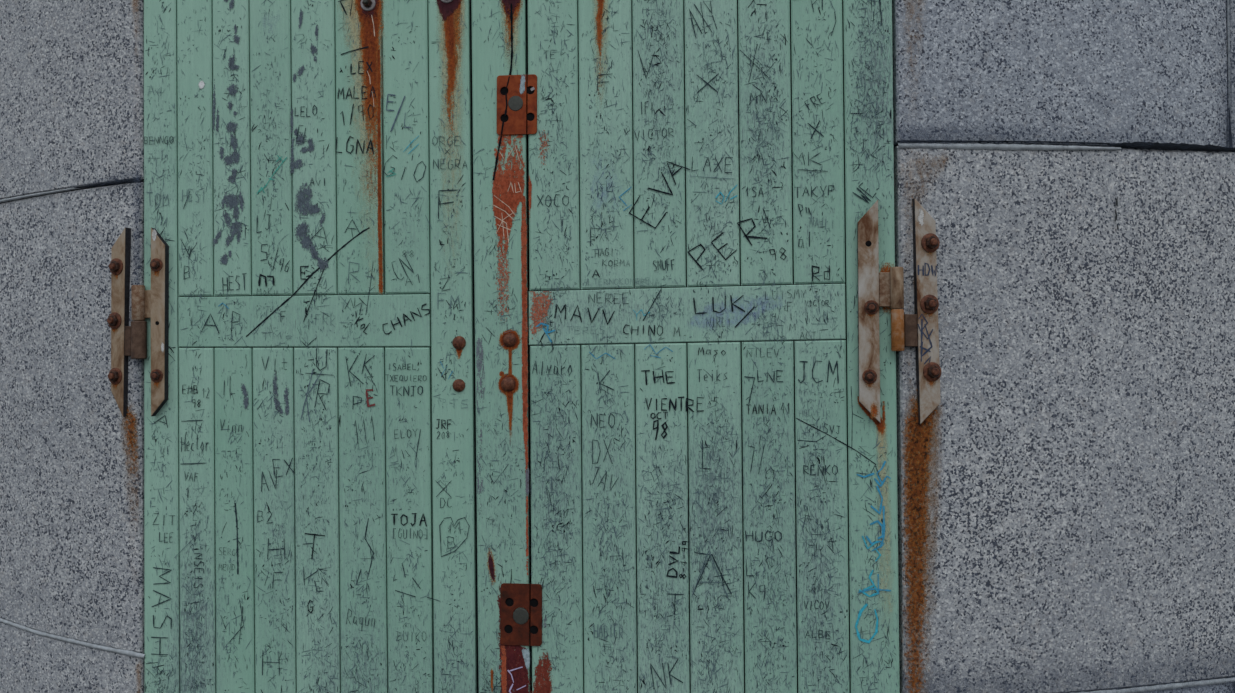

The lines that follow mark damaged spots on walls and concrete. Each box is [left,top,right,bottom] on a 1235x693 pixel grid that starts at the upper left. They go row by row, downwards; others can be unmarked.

rust [342,0,384,293]
rust [437,0,465,180]
rust [501,0,521,52]
rust [594,0,608,78]
rust [498,329,521,435]
rust [857,380,941,693]